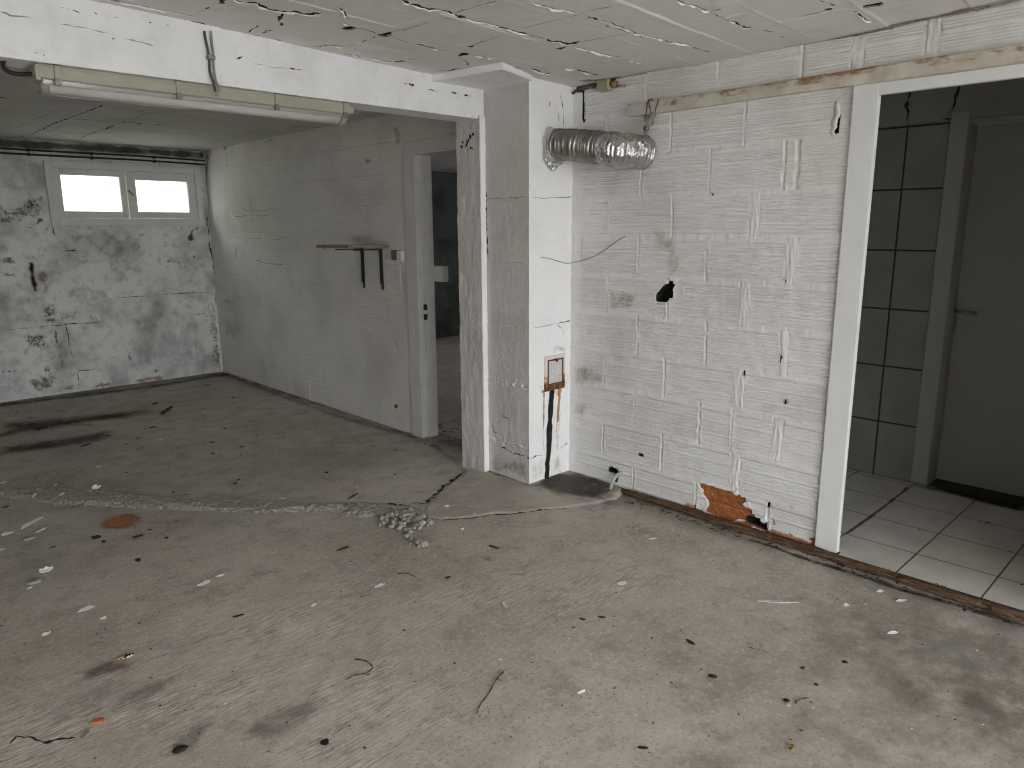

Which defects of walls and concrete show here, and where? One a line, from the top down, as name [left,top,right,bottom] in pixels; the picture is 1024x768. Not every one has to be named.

crack [674,0,785,38]
crack [803,0,873,23]
crack [57,0,709,123]
spalling [829,101,841,135]
crack [944,86,960,120]
crack [486,193,571,254]
spalling [654,280,684,303]
leakage [28,307,58,347]
corrosion [542,388,561,427]
leakage [539,390,610,497]
crack [387,472,569,520]
peeling [685,483,815,546]